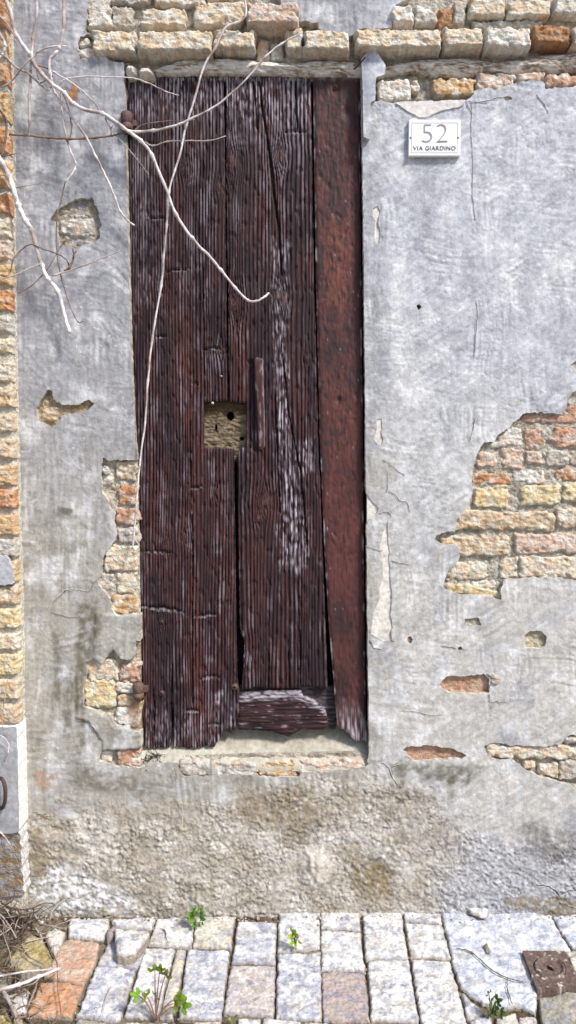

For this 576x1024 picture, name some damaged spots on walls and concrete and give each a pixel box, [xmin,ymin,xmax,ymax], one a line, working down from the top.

spalling [52,198,102,248]
spalling [38,390,94,426]
peeling [366,494,378,523]
spalling [435,391,576,599]
spalling [99,458,142,614]
peeling [370,522,412,649]
spalling [525,631,546,648]
spalling [84,641,143,729]
spalling [439,673,501,693]
spalling [101,747,143,767]
spalling [404,745,465,760]
spalling [484,734,576,783]